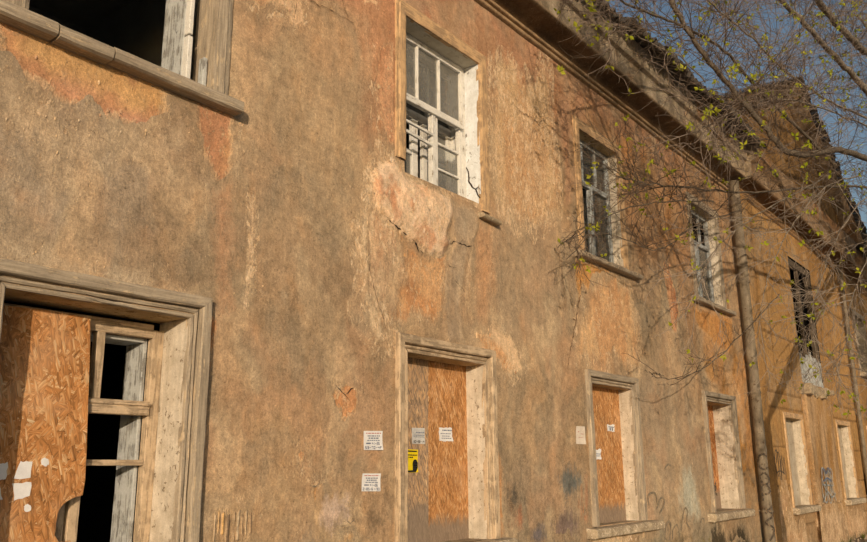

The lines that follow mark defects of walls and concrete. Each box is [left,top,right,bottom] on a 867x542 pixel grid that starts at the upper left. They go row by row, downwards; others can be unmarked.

peeling [0,22,241,226]
peeling [343,33,577,383]
crack [568,280,582,365]